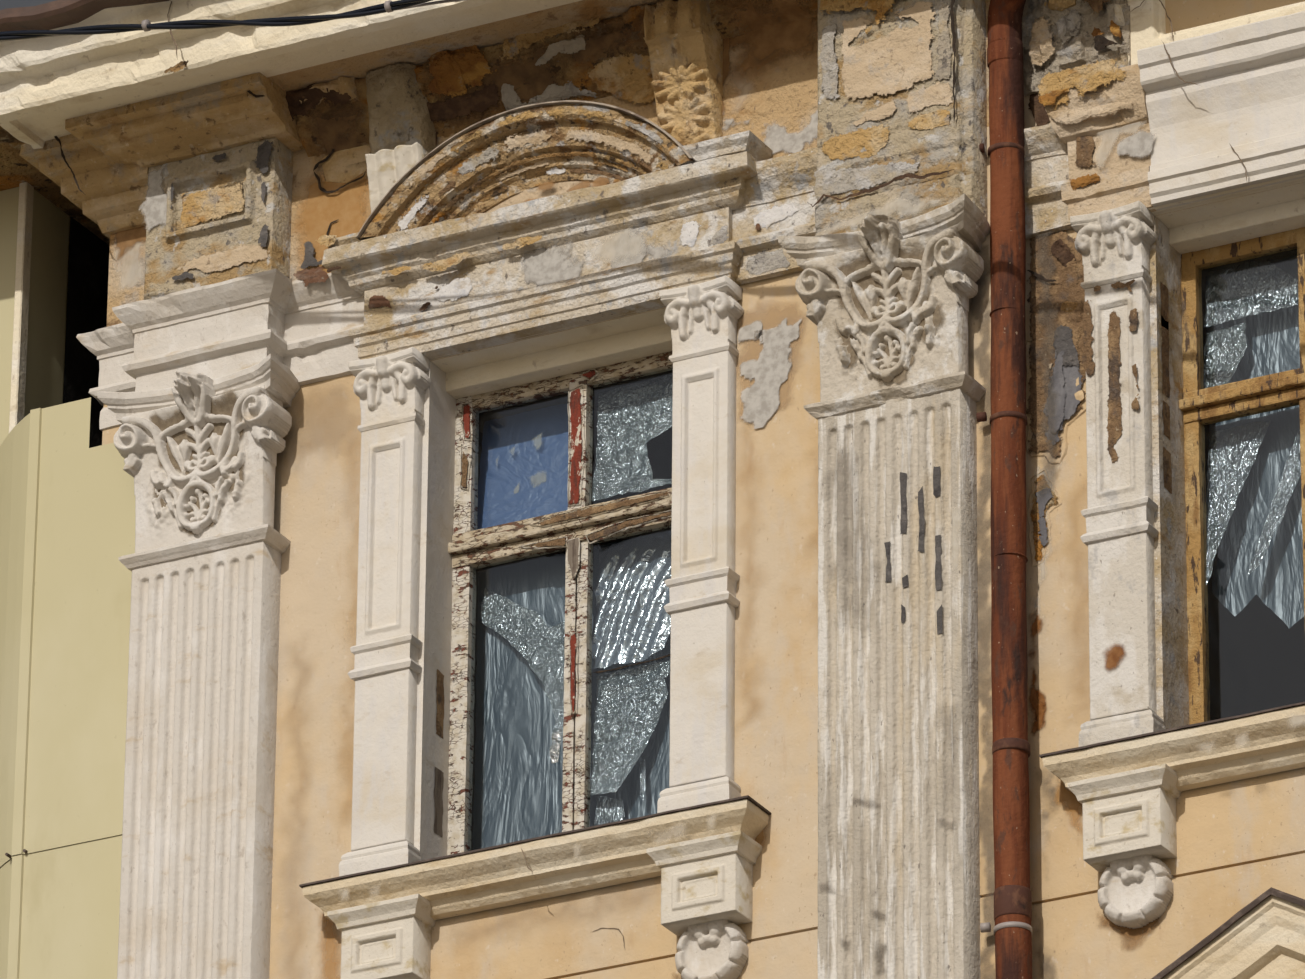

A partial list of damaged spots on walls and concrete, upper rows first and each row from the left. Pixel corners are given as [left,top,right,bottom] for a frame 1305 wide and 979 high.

crack [54,136,83,193]
flaking render [398,4,669,231]
flaking render [821,82,953,163]
flaking render [1022,0,1139,190]
crack [1132,0,1198,85]
peeling [381,252,472,311]
peeling [502,235,584,286]
peeling [738,318,801,429]
spalling [1026,230,1139,567]
peeling [1160,281,1172,494]
corrosion [1029,616,1046,734]
corrosion [1105,645,1125,670]